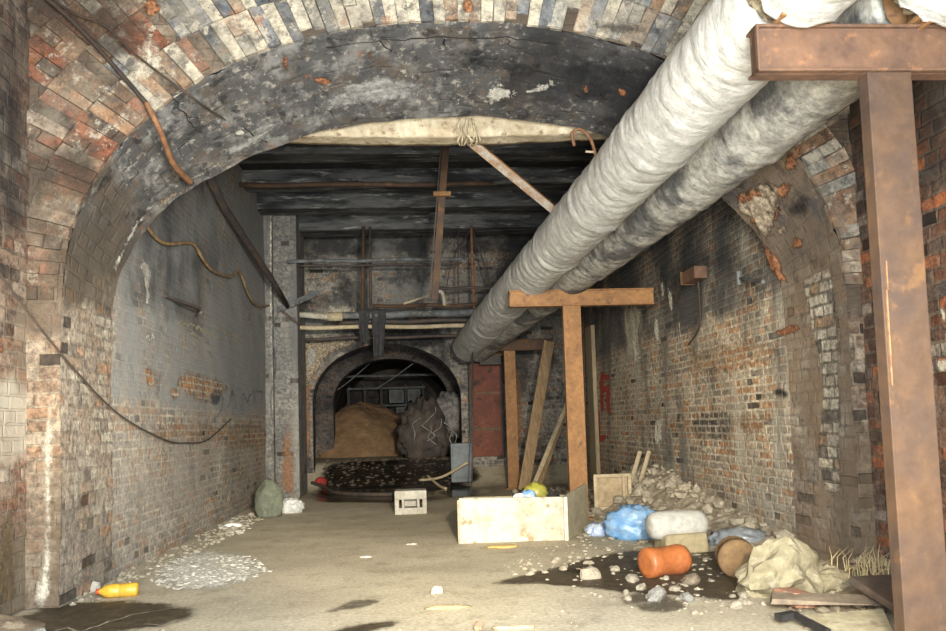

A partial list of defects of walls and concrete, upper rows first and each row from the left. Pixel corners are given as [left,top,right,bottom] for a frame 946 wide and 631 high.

peeling [170,372,227,402]